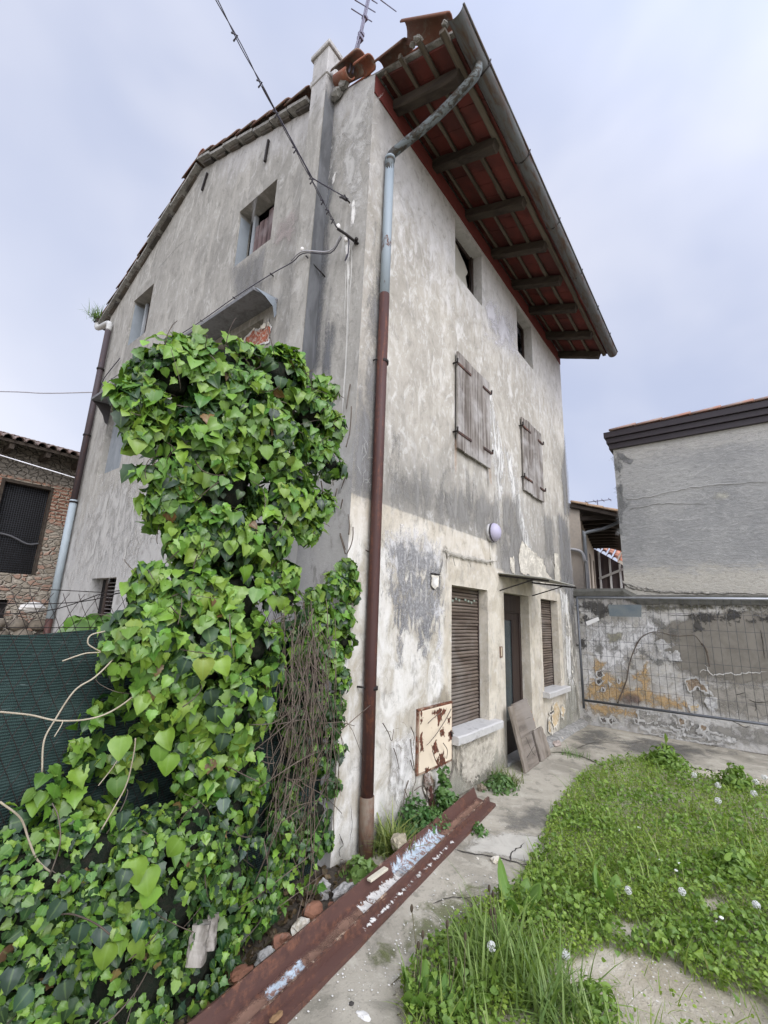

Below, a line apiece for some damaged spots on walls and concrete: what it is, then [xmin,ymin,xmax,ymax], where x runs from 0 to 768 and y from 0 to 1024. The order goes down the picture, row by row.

peeling [243,319,272,345]
leakage [385,529,444,666]
peeling [655,639,682,663]
peeling [595,670,621,692]
peeling [548,701,566,735]
peeling [633,676,737,745]